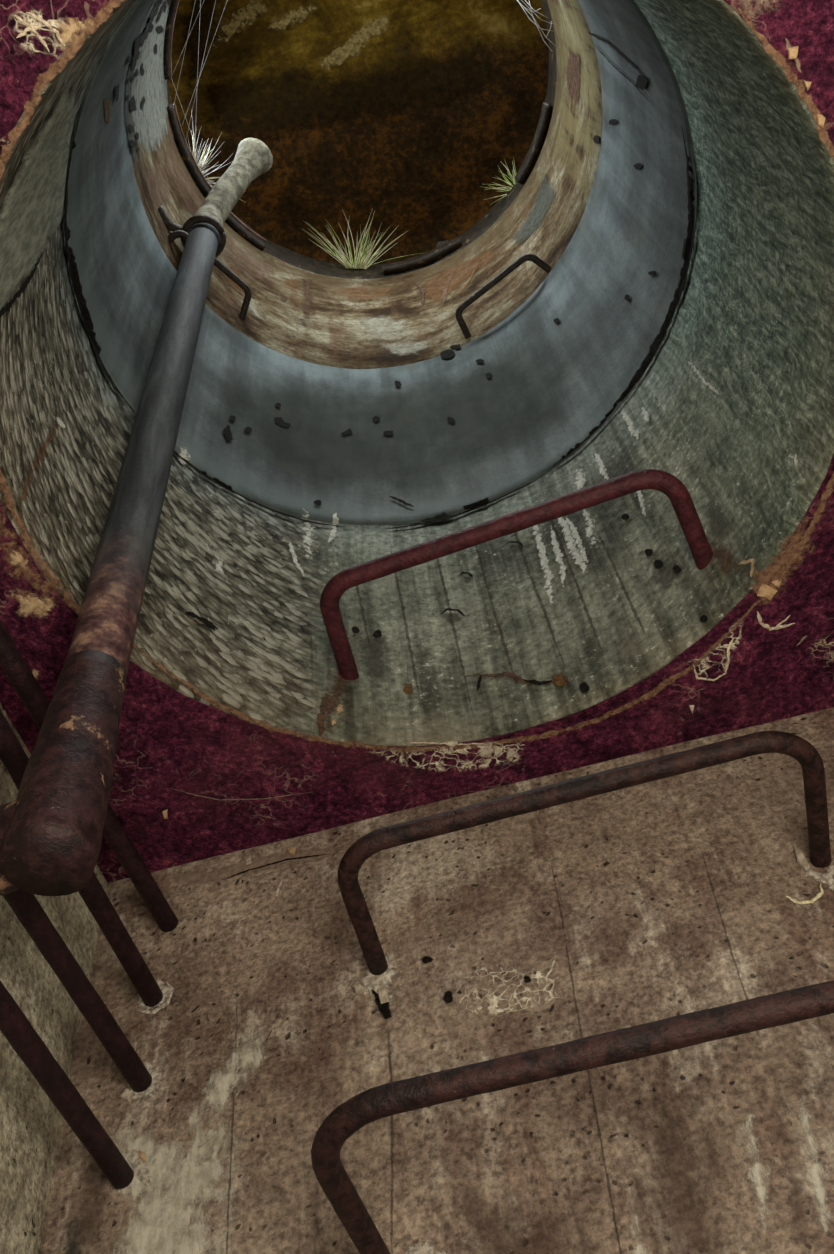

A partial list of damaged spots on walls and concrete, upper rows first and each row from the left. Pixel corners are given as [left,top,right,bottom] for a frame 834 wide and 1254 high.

corrosion [0,0,122,180]
peeling [104,0,172,163]
corrosion [183,0,215,87]
corrosion [738,7,834,161]
corrosion [0,469,81,618]
leakage [533,509,600,603]
leakage [574,453,609,489]
leakage [621,490,646,520]
leakage [621,407,649,439]
leakage [688,361,719,394]
corrosion [778,474,834,582]
corrosion [133,599,761,754]